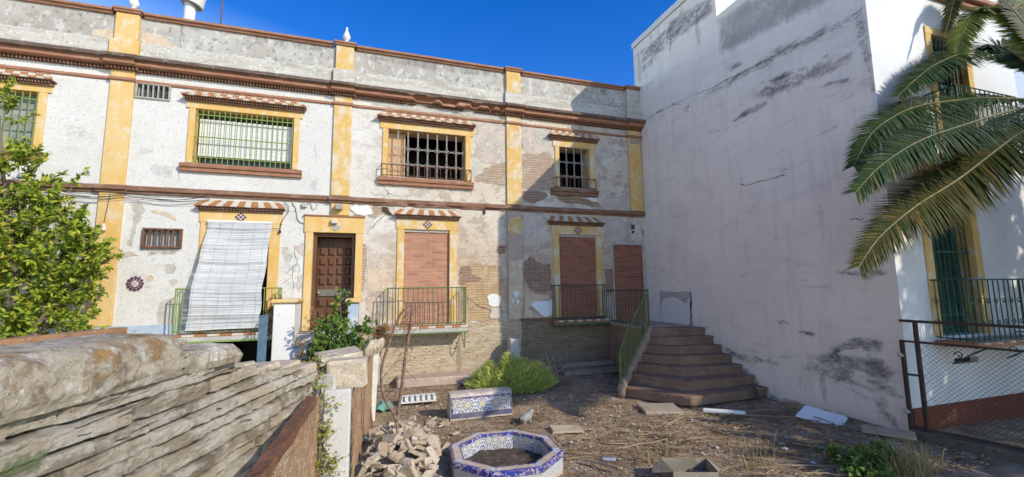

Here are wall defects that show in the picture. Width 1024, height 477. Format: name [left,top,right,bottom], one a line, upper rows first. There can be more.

leakage [645,0,709,58]
peeling [455,110,507,186]
flaking render [459,126,556,322]
leakage [823,339,889,390]